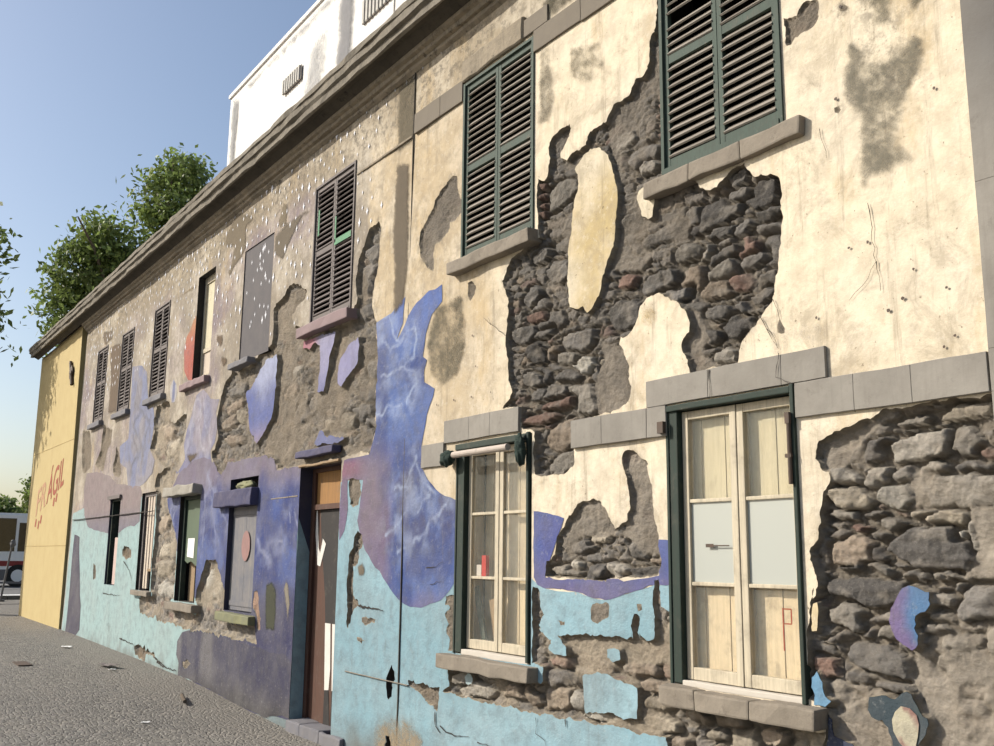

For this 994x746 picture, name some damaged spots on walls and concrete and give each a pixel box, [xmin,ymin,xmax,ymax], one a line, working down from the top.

spalling [783,0,819,46]
damp [845,37,920,183]
spalling [419,176,461,271]
spalling [502,0,783,476]
crack [850,203,881,299]
spalling [139,401,289,644]
spalling [346,531,375,627]
spalling [408,393,994,746]